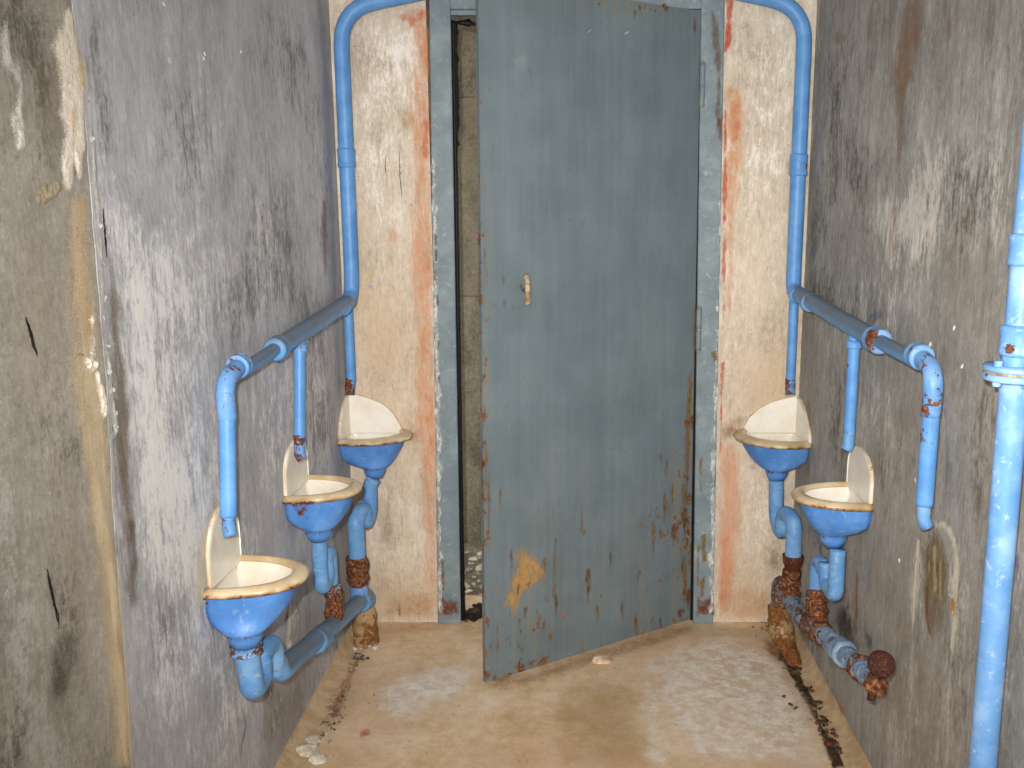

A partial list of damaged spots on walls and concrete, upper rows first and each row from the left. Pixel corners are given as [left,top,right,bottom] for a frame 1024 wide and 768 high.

rust [724,0,734,52]
rust [722,79,751,318]
crack [101,212,109,257]
crack [25,317,38,356]
rust [388,7,461,617]
crack [47,569,59,630]